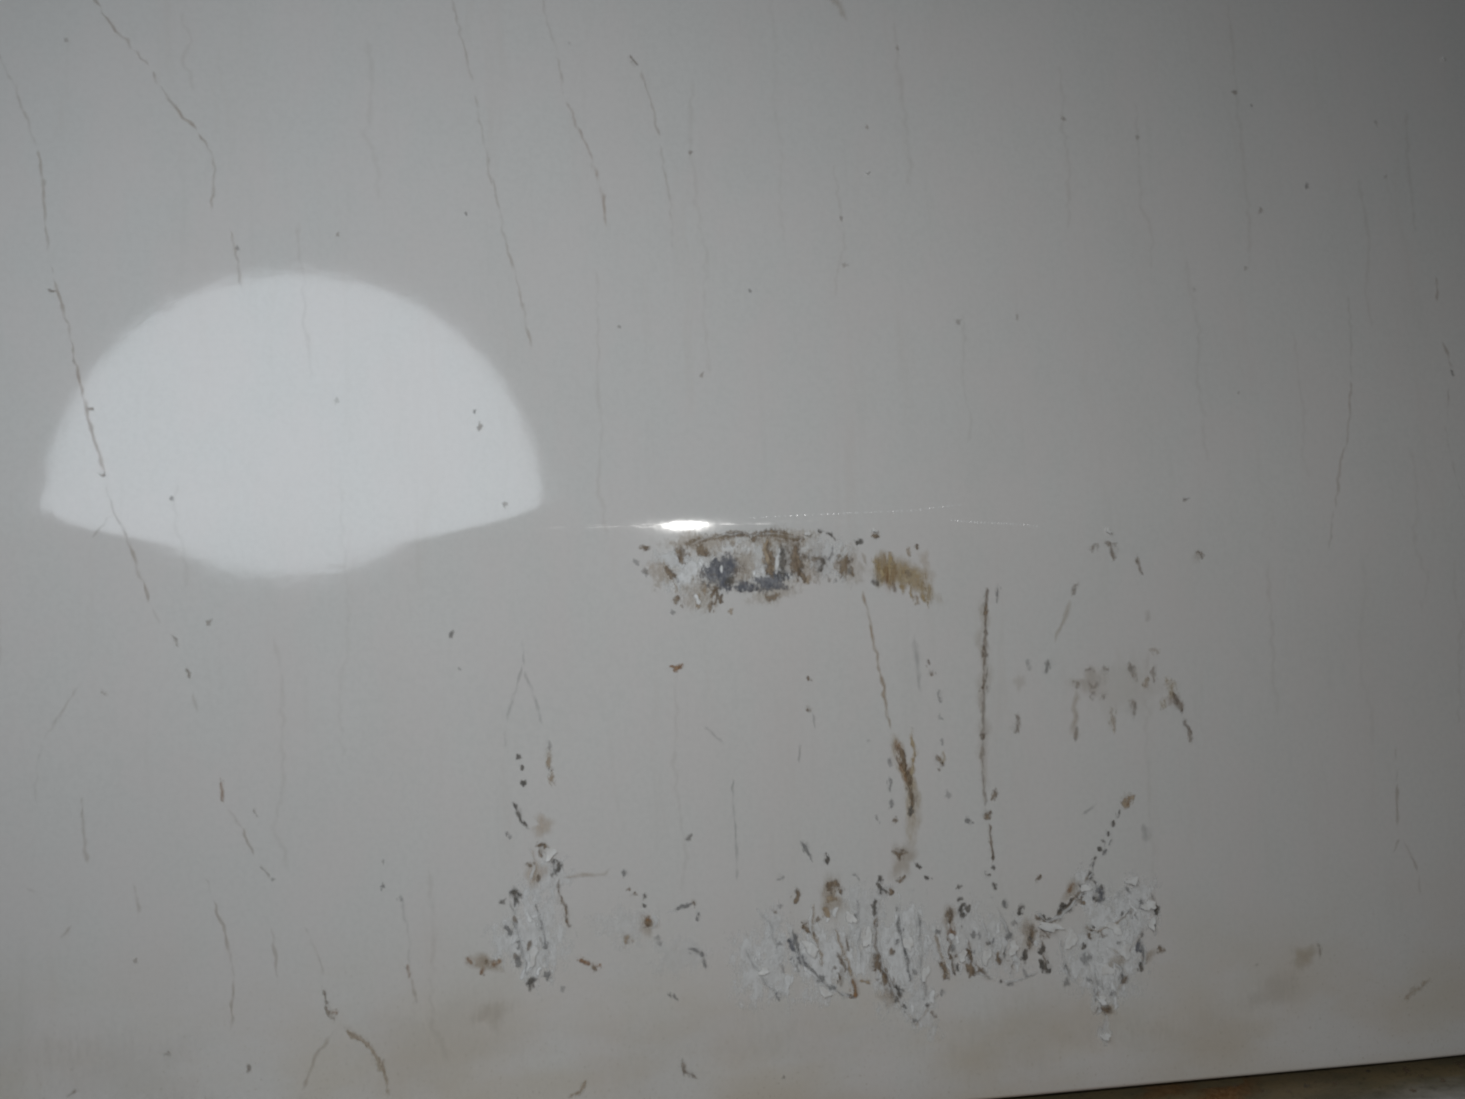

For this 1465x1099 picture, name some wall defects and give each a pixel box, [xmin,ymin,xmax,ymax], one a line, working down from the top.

peeling [642,528,879,612]
rust [898,737,915,816]
peeling [489,843,568,989]
peeling [730,844,1164,1043]